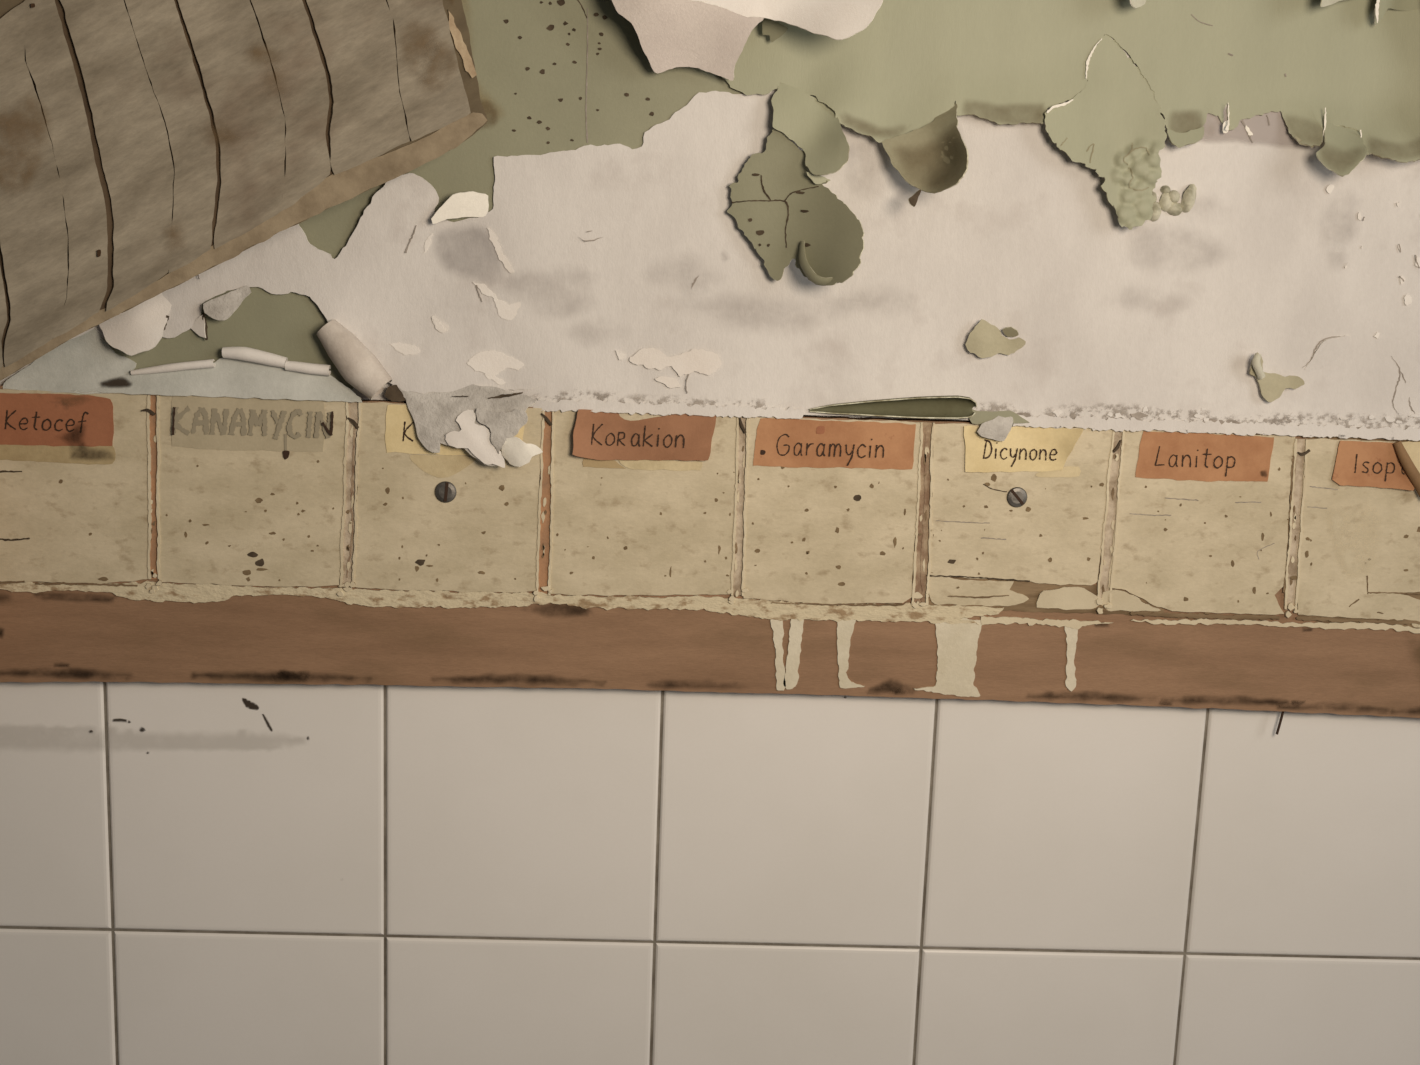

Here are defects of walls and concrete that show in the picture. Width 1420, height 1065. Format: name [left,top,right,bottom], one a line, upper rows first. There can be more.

peeling [3,0,1420,468]